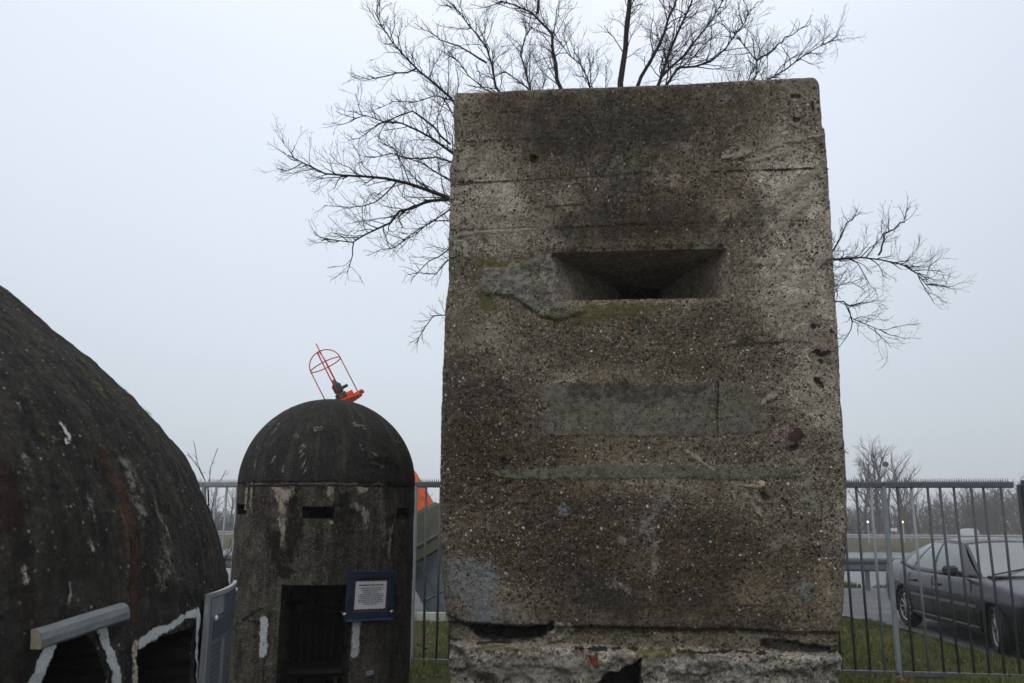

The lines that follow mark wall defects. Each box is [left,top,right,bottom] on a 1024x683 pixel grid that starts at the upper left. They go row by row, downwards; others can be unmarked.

spalling [595,656,644,683]